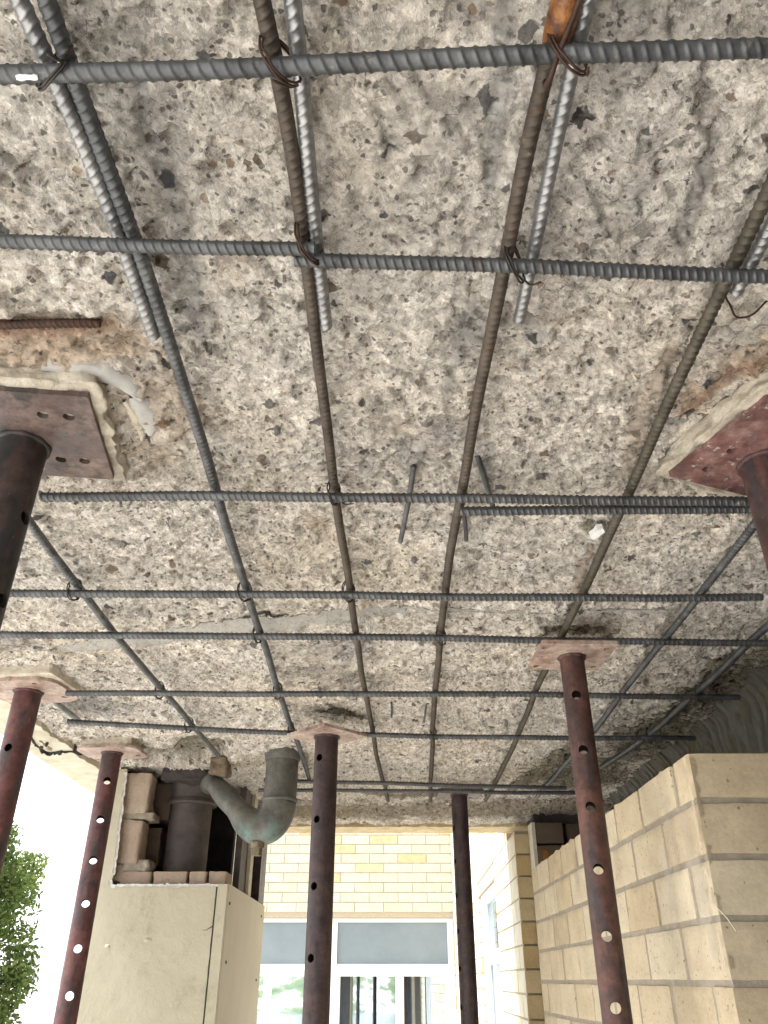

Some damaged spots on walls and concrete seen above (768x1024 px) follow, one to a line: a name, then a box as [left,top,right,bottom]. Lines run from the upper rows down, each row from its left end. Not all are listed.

corrosion [542,0,583,89]
corrosion [0,318,128,367]
spalling [583,518,605,540]
spalling [41,605,565,652]
spalling [690,759,704,816]